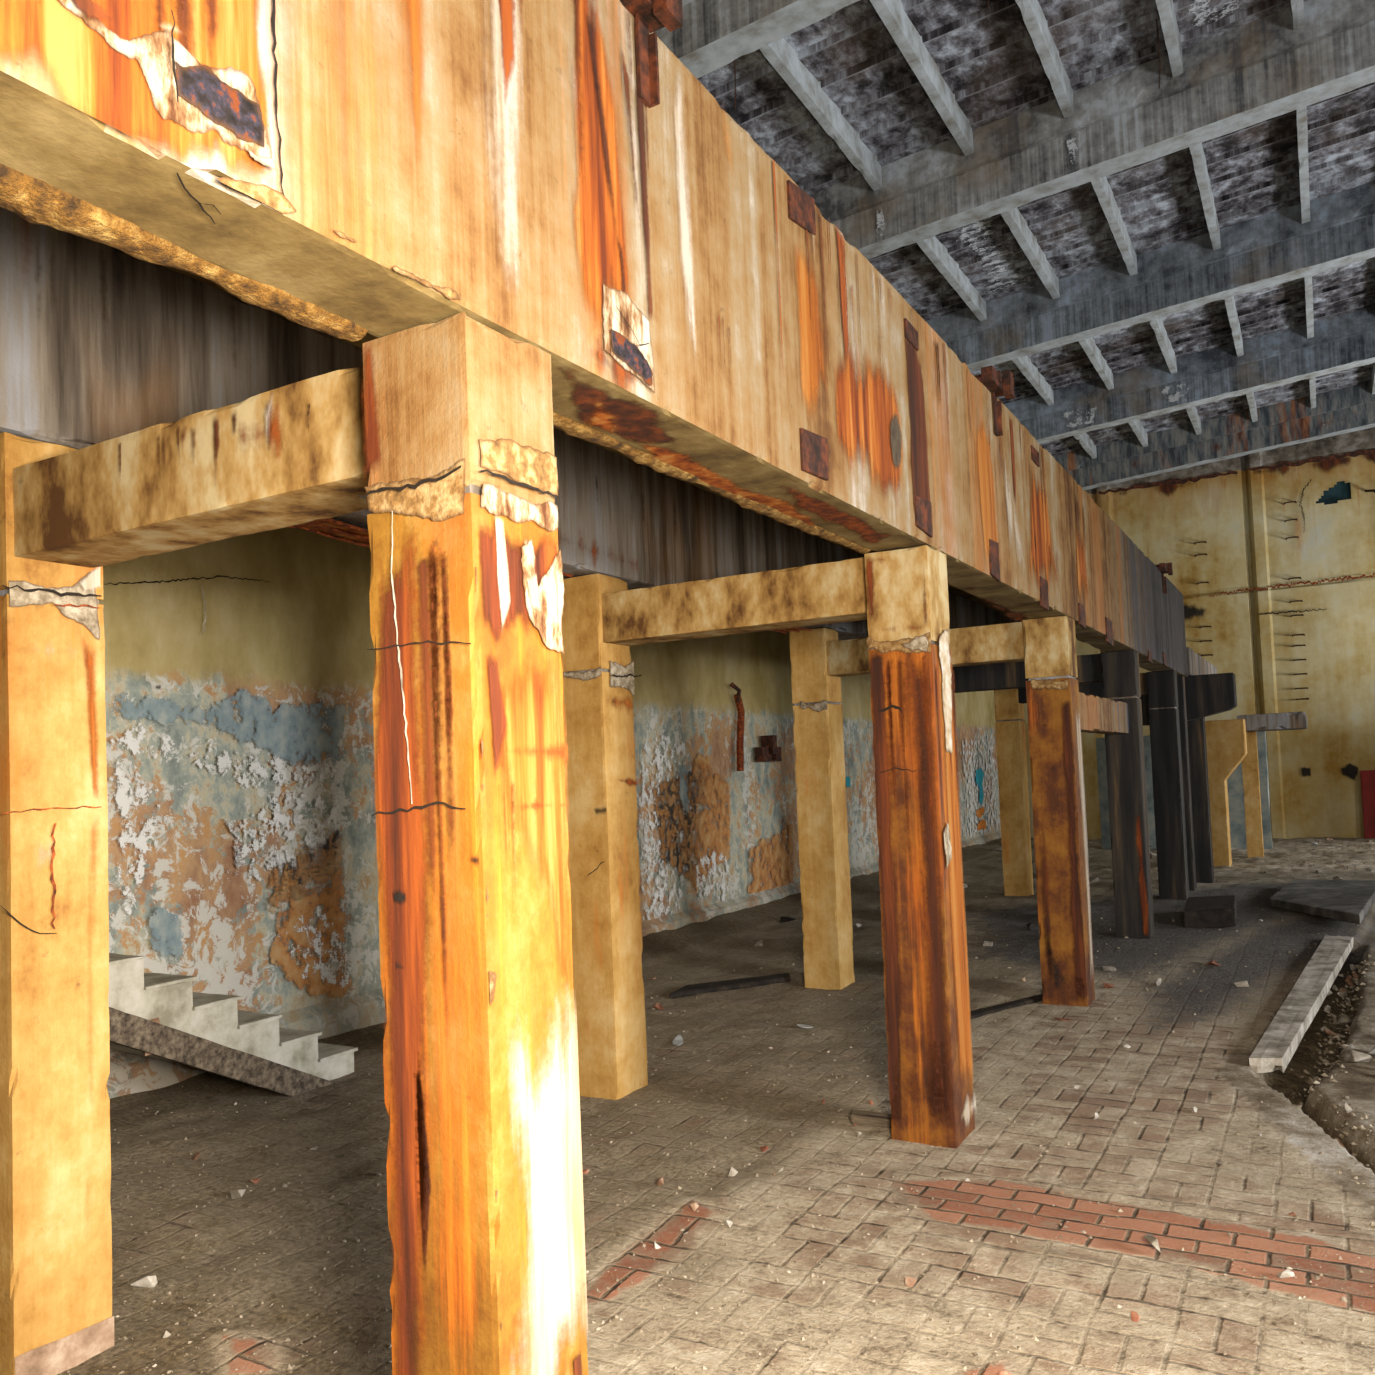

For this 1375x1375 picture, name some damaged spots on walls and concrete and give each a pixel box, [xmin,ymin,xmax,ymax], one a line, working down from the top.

spalling [58,0,277,170]
corrosion [574,0,653,319]
spalling [603,284,655,393]
corrosion [797,217,949,512]
spalling [2,568,102,640]
spalling [358,438,573,654]
corrosion [480,519,557,639]
crack [1,906,57,934]
crack [2,806,101,814]
peeling [109,686,354,999]
corrosion [375,511,457,1375]
corrosion [870,655,972,1121]